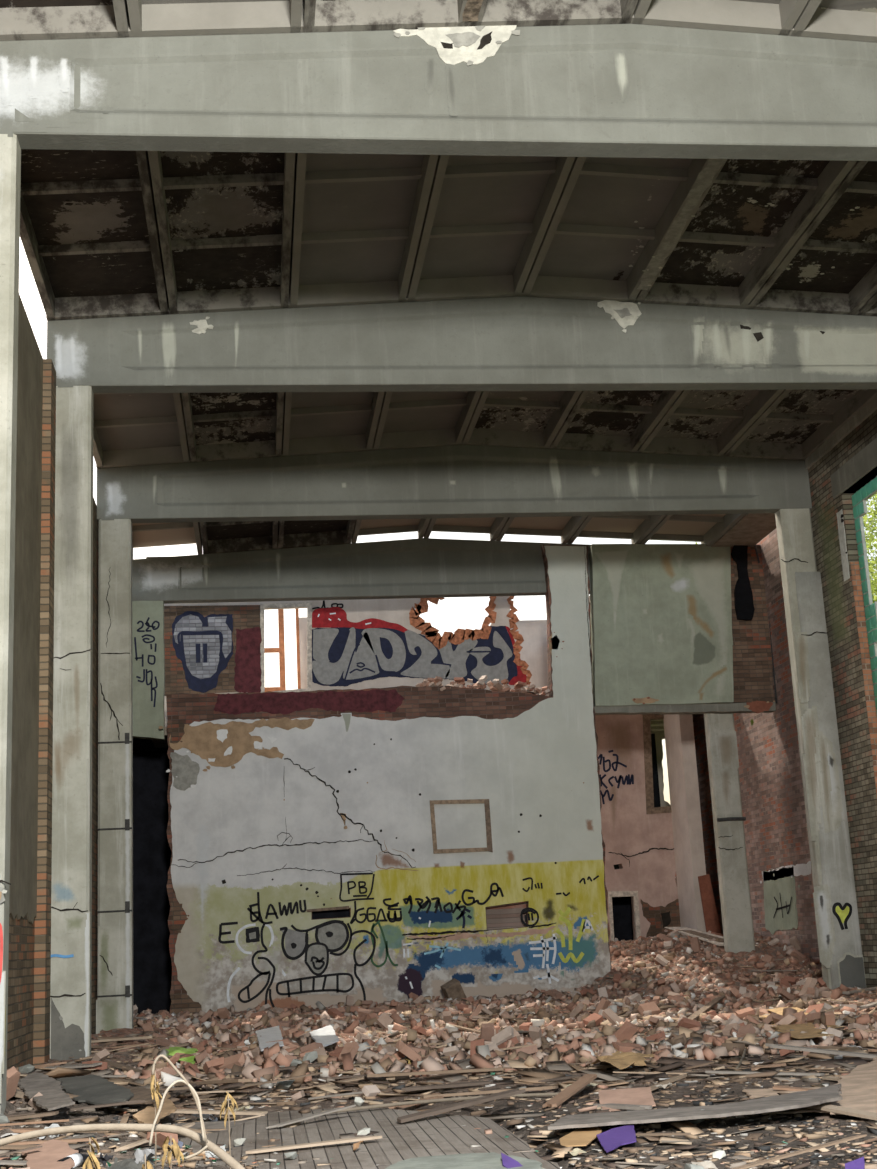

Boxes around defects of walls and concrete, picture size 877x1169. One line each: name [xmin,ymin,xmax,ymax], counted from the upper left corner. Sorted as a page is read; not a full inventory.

peeling [393,0,520,66]
spalling [597,159,727,333]
spalling [409,596,532,685]
flaking render [159,717,315,791]
crack [176,758,418,876]